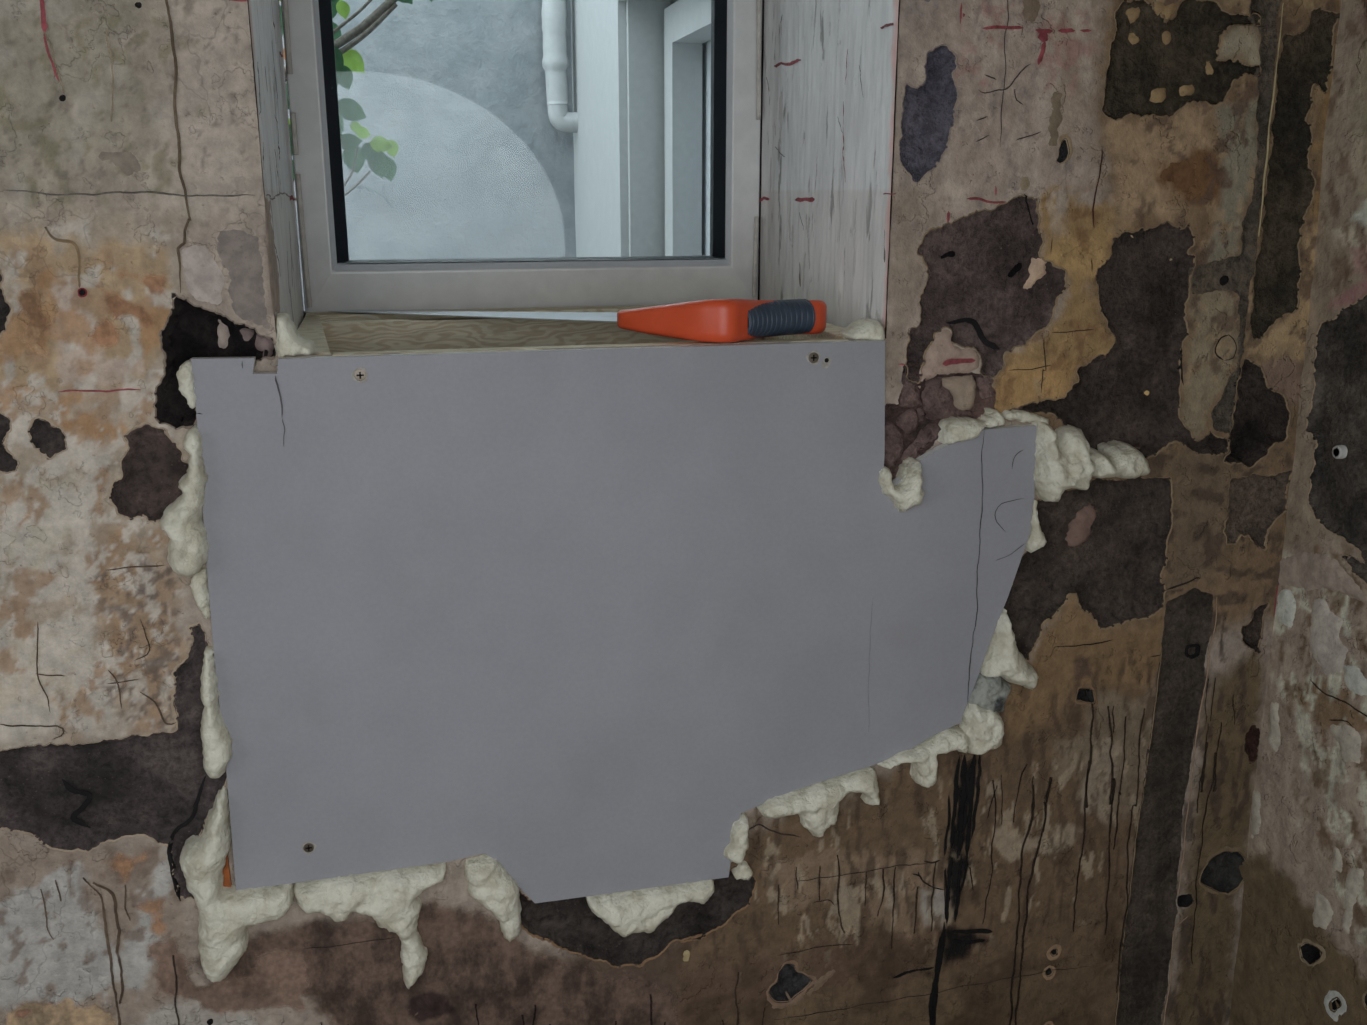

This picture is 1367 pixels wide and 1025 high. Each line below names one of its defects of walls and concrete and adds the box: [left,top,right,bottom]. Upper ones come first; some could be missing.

crack [165,0,191,293]
flaking render [899,44,959,184]
flaking render [1101,0,1340,342]
flaking render [108,293,277,523]
flaking render [884,177,1367,696]
flaking render [0,622,227,901]
leakage [149,903,676,1025]
flaking render [519,866,757,968]
leakage [837,855,845,934]
leakage [865,867,896,949]
leakage [892,754,1052,1025]
leakage [1073,657,1145,993]